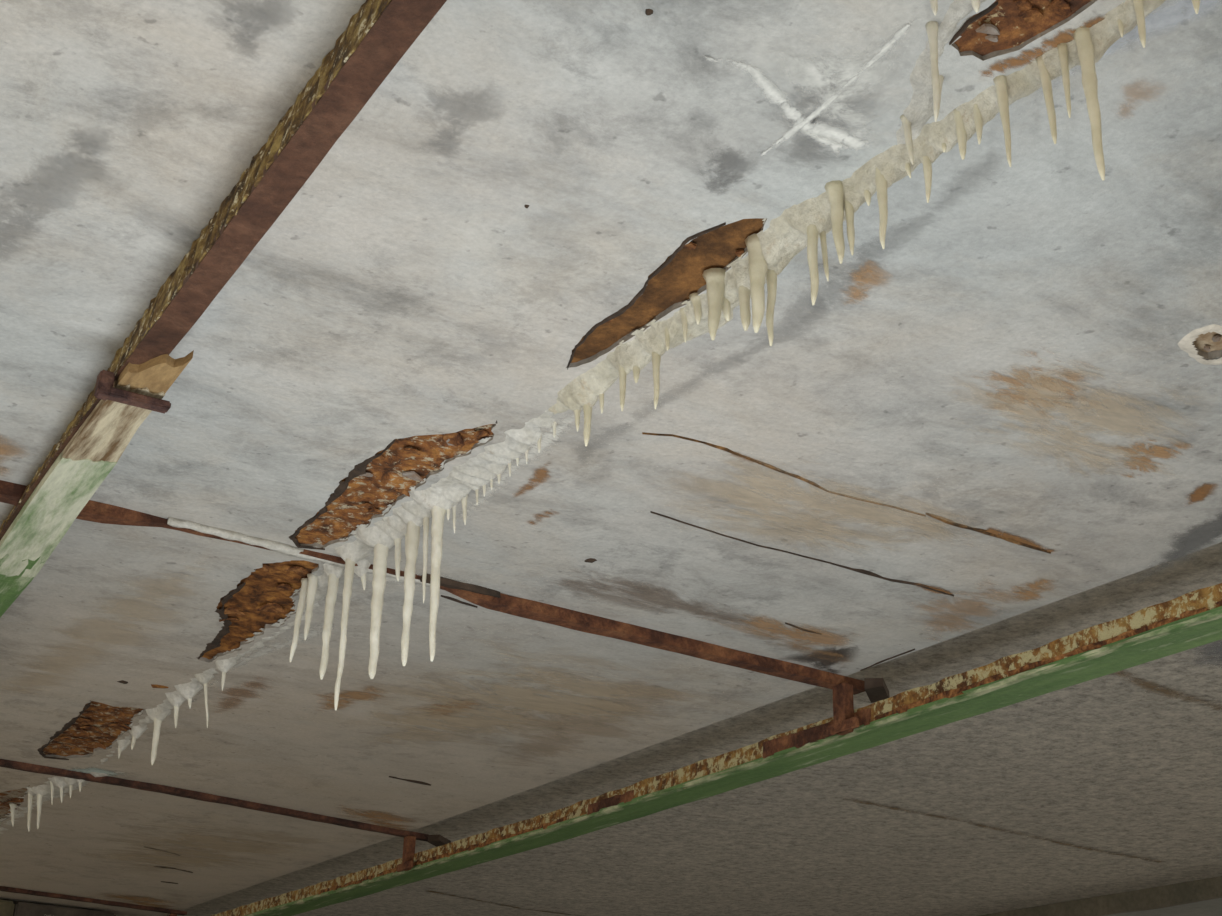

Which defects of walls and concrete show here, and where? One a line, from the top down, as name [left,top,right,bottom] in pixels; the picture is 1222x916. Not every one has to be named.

spalling [949,0,1092,56]
spalling [567,218,765,370]
leakage [70,0,1180,777]
crack [642,432,1054,554]
spalling [198,424,493,659]
leakage [1159,516,1222,568]
rust [854,600,1222,726]
rust [324,687,380,709]
spalling [38,701,143,760]
rust [763,720,833,759]
leakage [0,776,90,834]
rust [587,790,634,815]